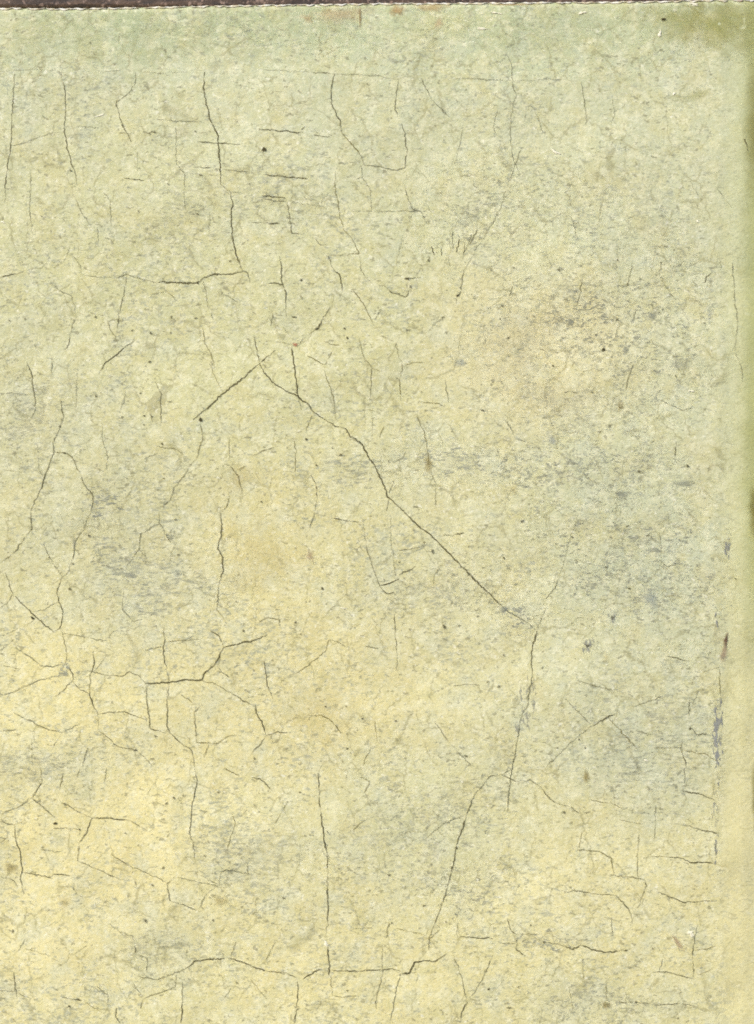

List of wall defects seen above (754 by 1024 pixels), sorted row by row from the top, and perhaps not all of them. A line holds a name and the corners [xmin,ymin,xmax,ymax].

crack [4,74,36,221]
crack [93,70,371,369]
crack [262,72,446,213]
crack [0,311,721,1023]